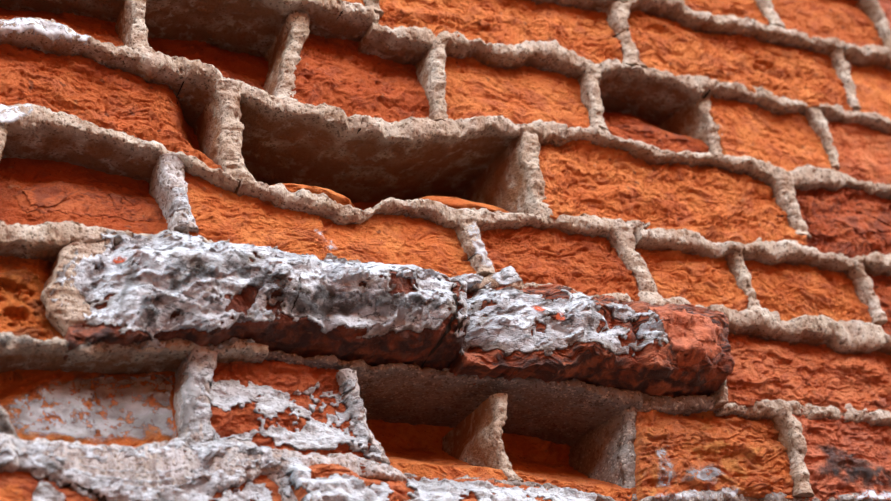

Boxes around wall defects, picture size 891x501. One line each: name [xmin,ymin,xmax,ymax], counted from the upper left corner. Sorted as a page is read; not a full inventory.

spalling [611,125,695,145]
peeling [0,177,722,501]